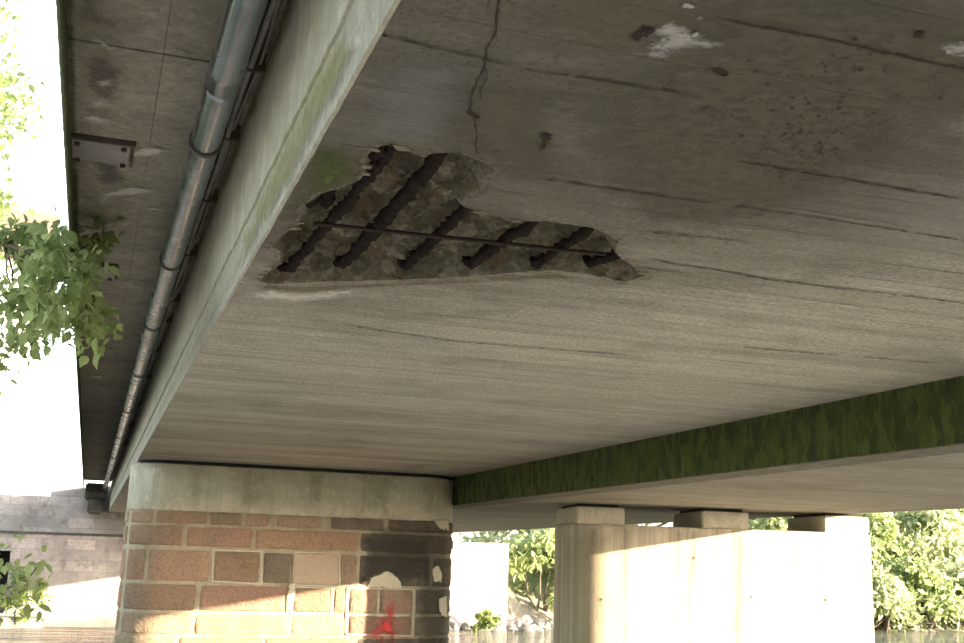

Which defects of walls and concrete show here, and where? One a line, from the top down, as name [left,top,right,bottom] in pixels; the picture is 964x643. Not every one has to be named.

crack [468,0,514,160]
damp [603,0,964,218]
spalling [256,143,648,286]